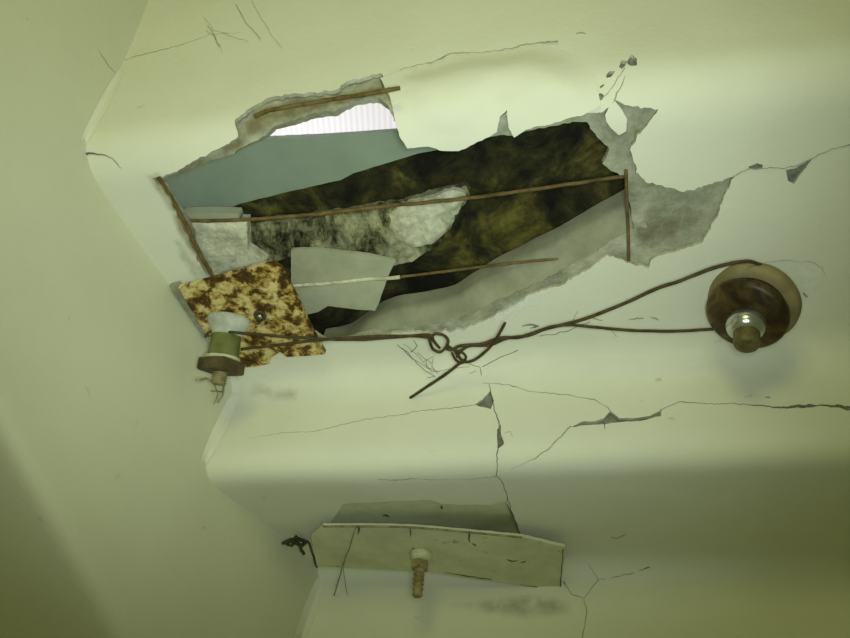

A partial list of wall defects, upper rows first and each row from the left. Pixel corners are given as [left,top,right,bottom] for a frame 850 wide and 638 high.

crack [97,31,240,71]
crack [400,32,586,70]
spalling [156,77,395,275]
crack [733,144,850,182]
spalling [315,101,731,342]
crack [265,383,850,534]
crack [563,562,650,638]